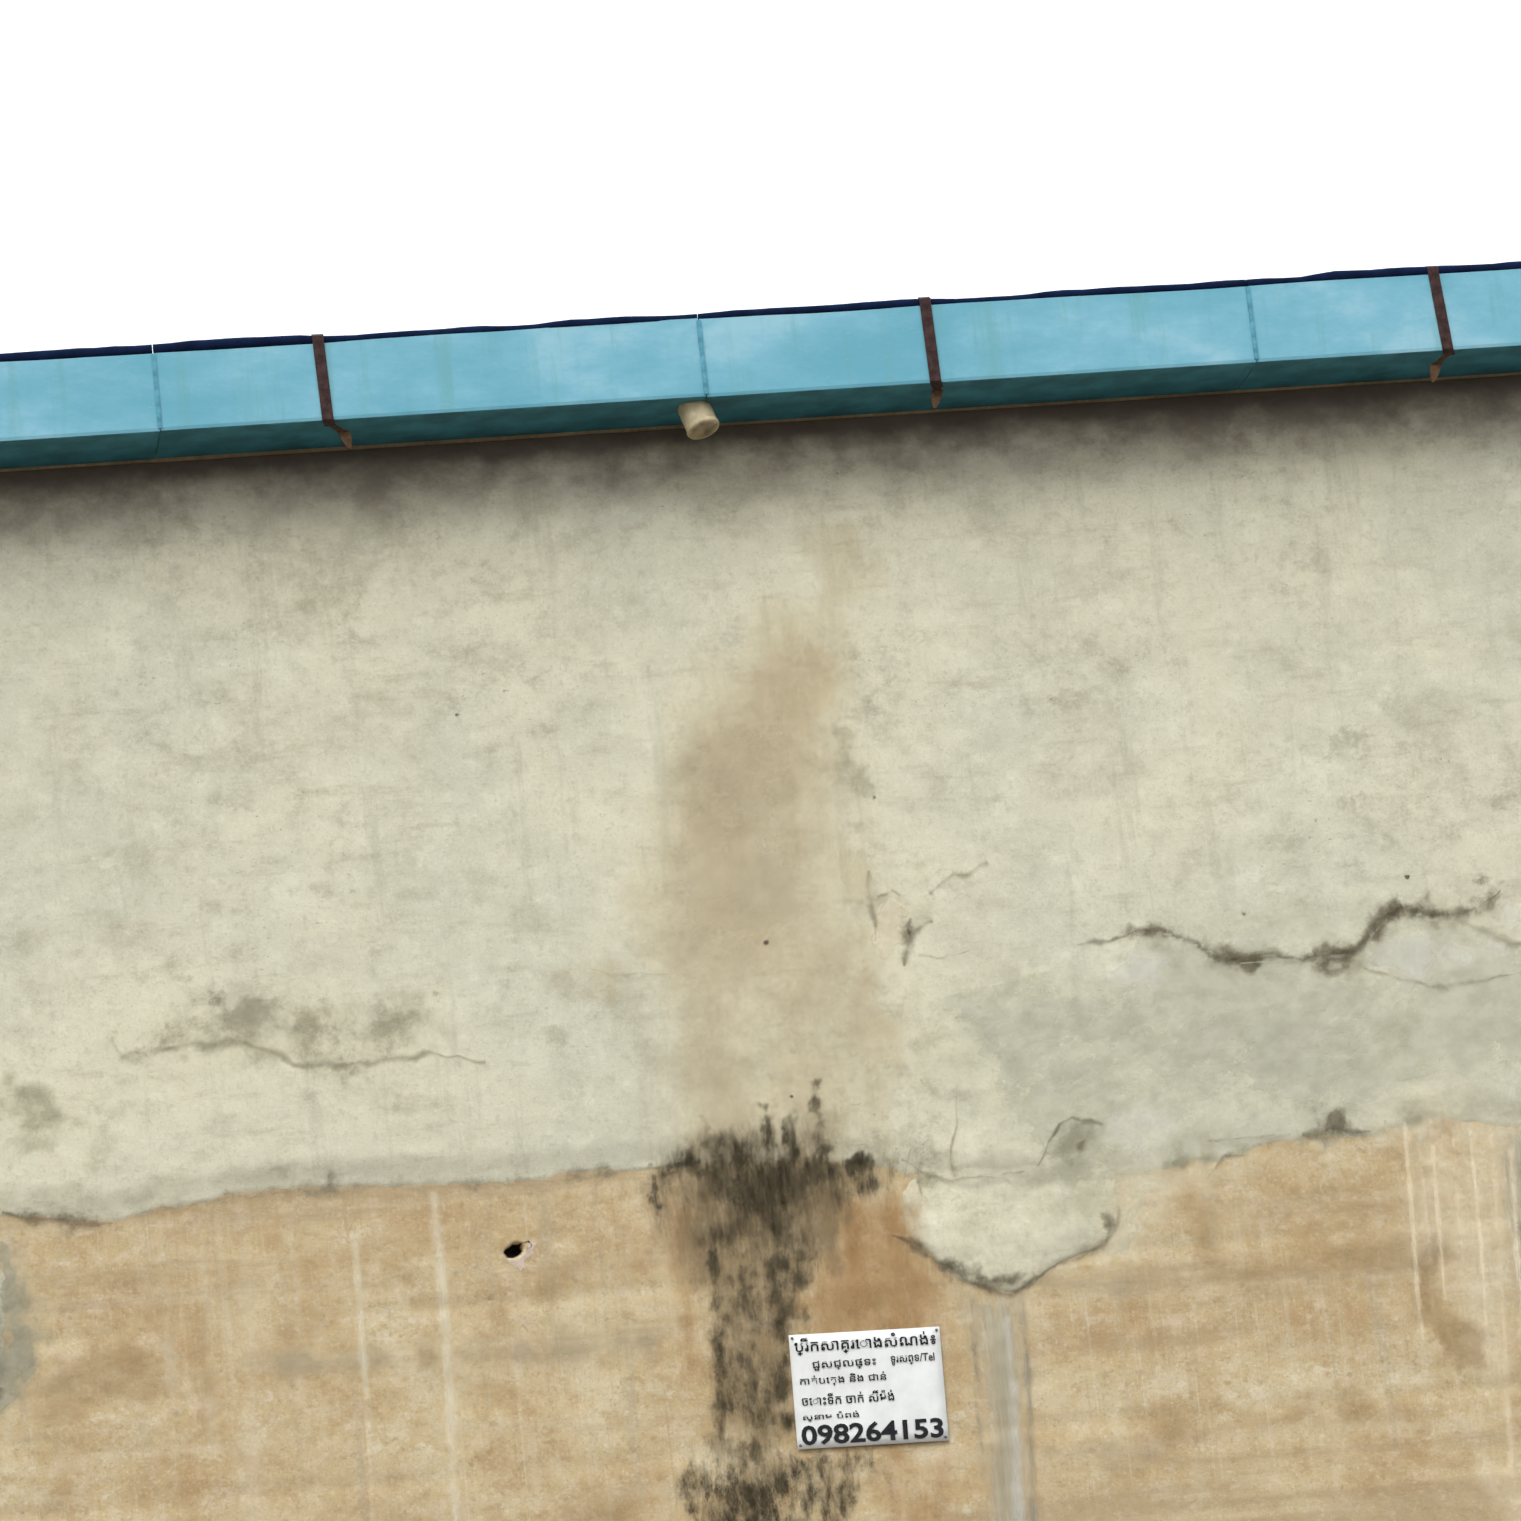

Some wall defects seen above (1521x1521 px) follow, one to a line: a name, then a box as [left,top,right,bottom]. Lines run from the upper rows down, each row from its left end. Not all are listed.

crack [1112,925,1170,940]
crack [1213,879,1494,973]
hole [504,1241,534,1269]
mould [650,1106,877,1431]
mould [682,1454,872,1521]